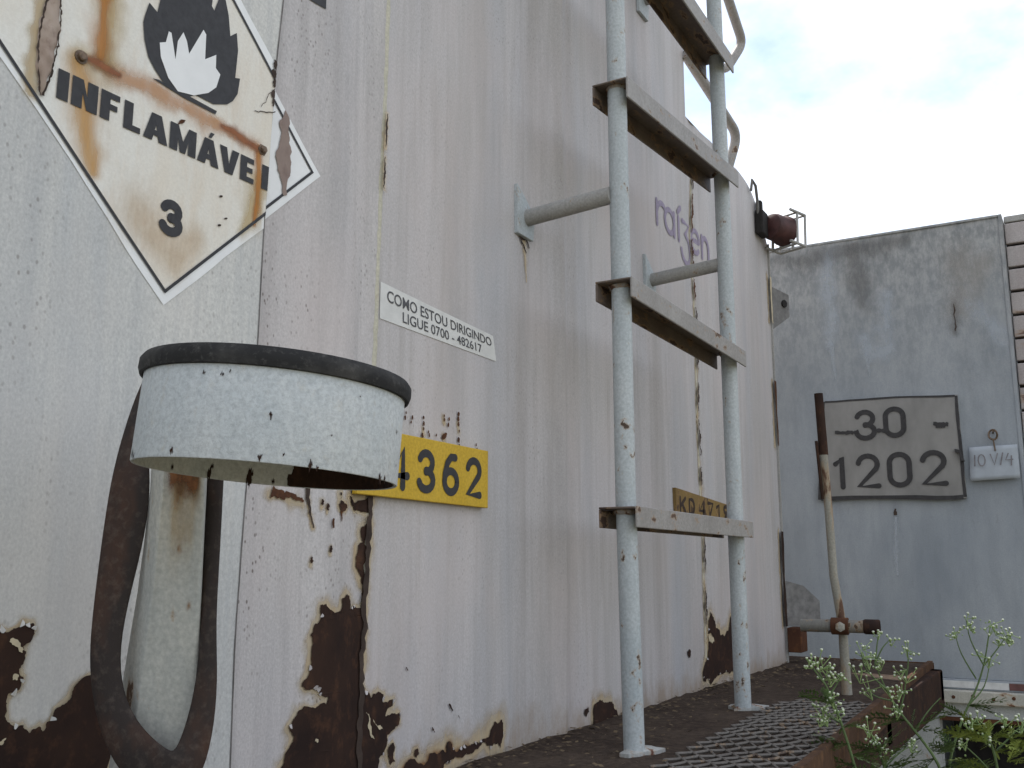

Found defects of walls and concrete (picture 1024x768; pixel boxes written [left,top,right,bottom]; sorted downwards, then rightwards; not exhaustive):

rust [404,411,460,445]